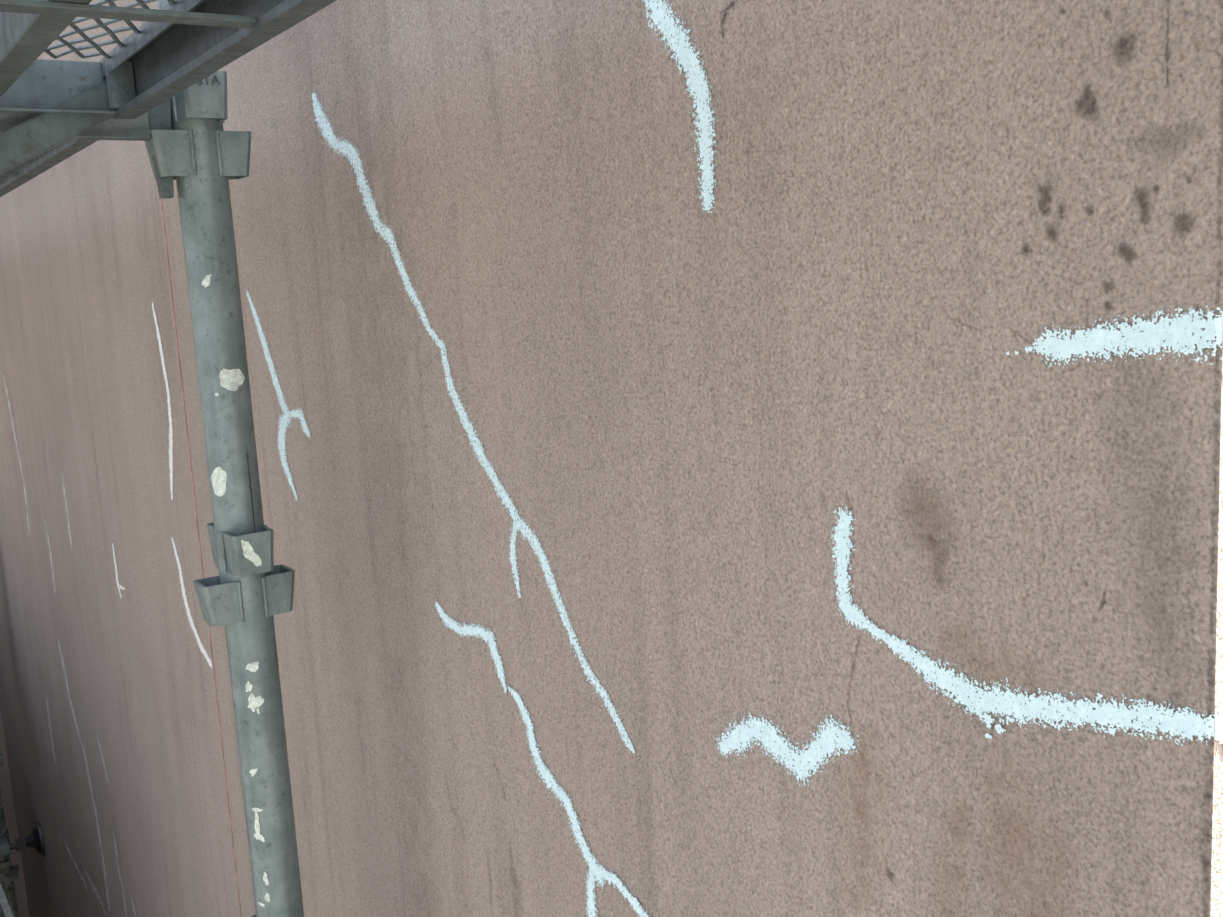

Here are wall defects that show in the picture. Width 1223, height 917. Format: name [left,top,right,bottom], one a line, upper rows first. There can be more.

crack [246,291,310,502]
crack [312,91,635,754]
crack [643,0,718,213]
leakage [1041,188,1063,213]
crack [1006,302,1223,368]
leakage [1119,247,1133,259]
leakage [1136,186,1158,222]
crack [829,506,1223,746]
crack [434,601,648,917]
crack [715,700,860,786]